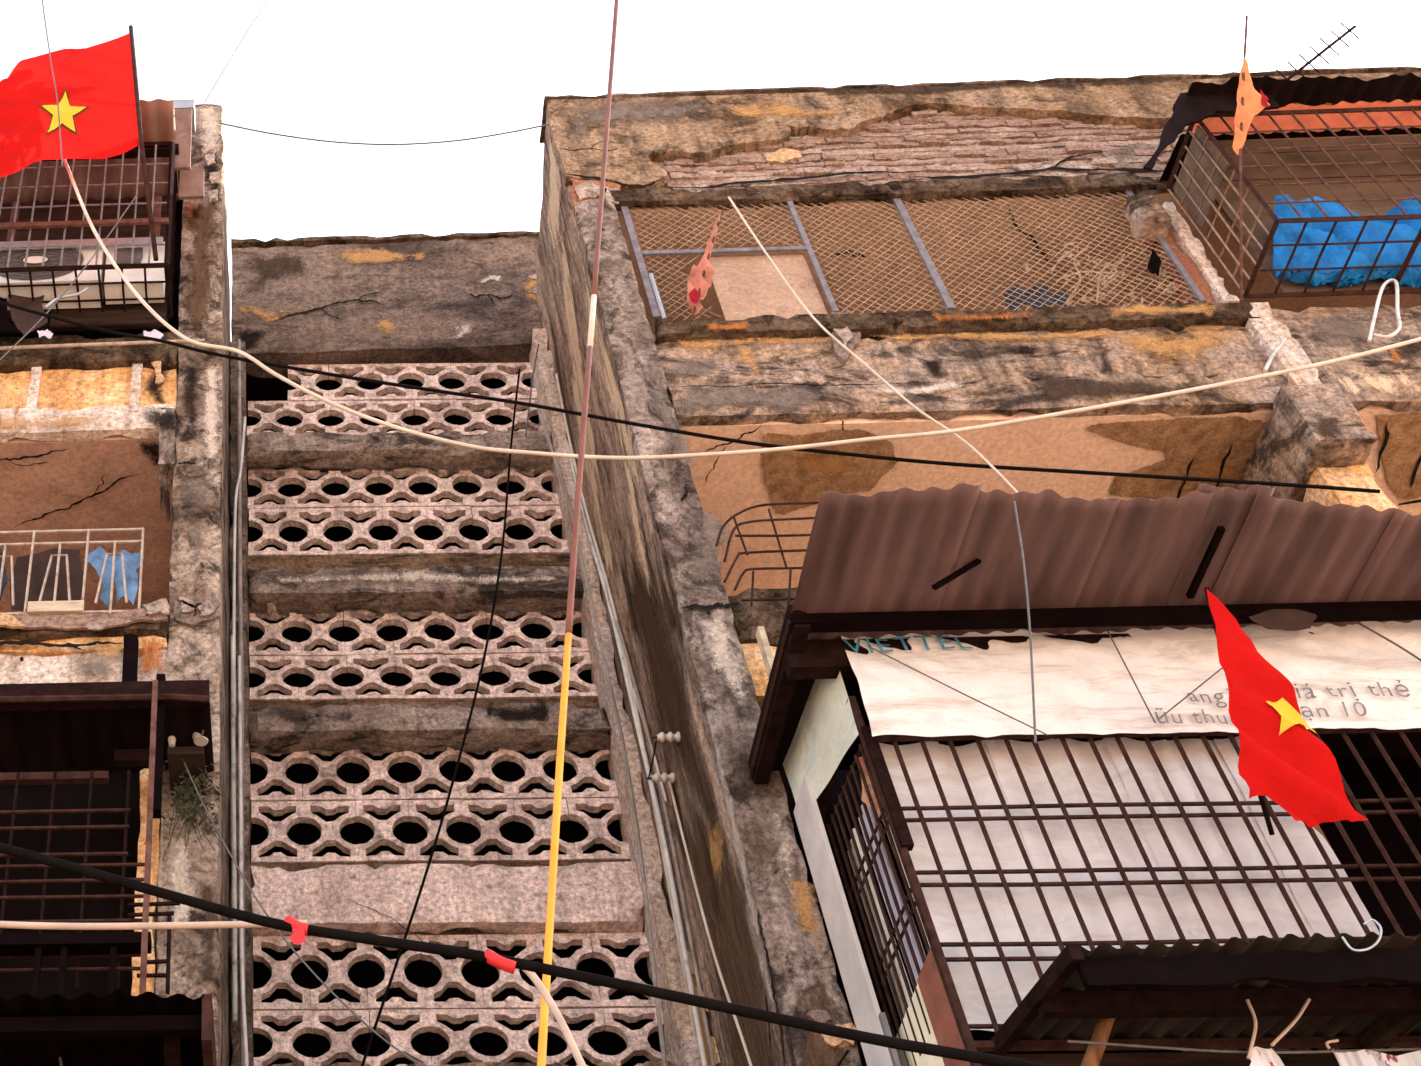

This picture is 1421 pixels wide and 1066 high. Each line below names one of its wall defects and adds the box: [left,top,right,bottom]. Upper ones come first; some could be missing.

spalling [548,109,1188,586]
crack [0,449,66,466]
crack [14,474,141,528]